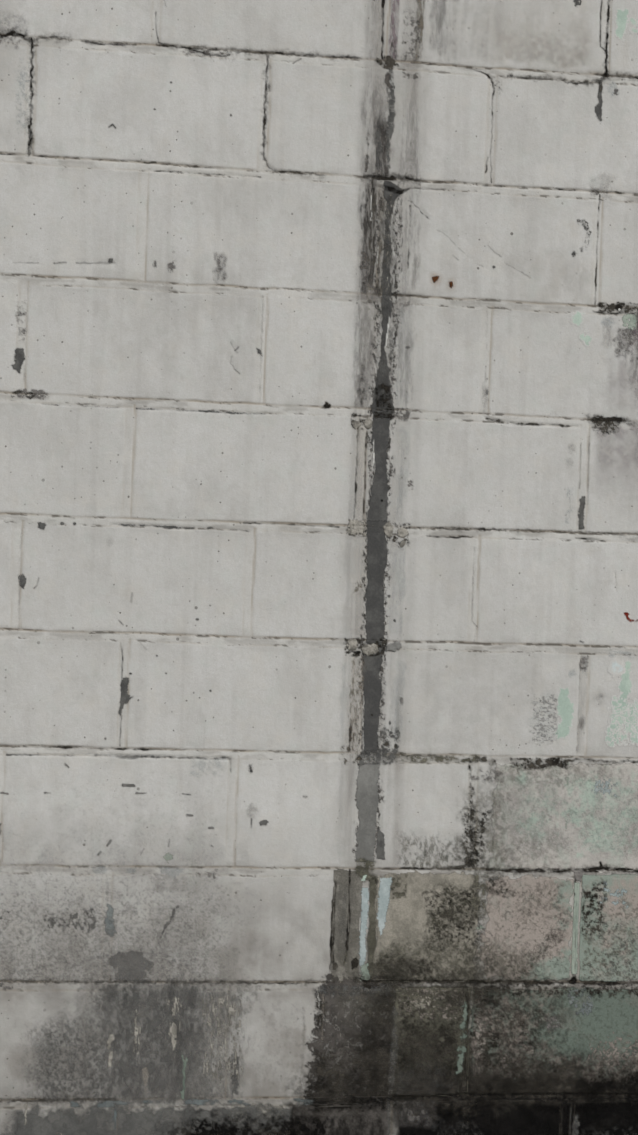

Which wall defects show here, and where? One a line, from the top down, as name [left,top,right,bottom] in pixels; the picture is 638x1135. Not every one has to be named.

peeling [329,181,402,981]
leakage [355,431,395,663]
leakage [358,0,424,424]
leakage [592,415,632,434]
leakage [597,302,638,352]
leakage [3,537,638,1135]